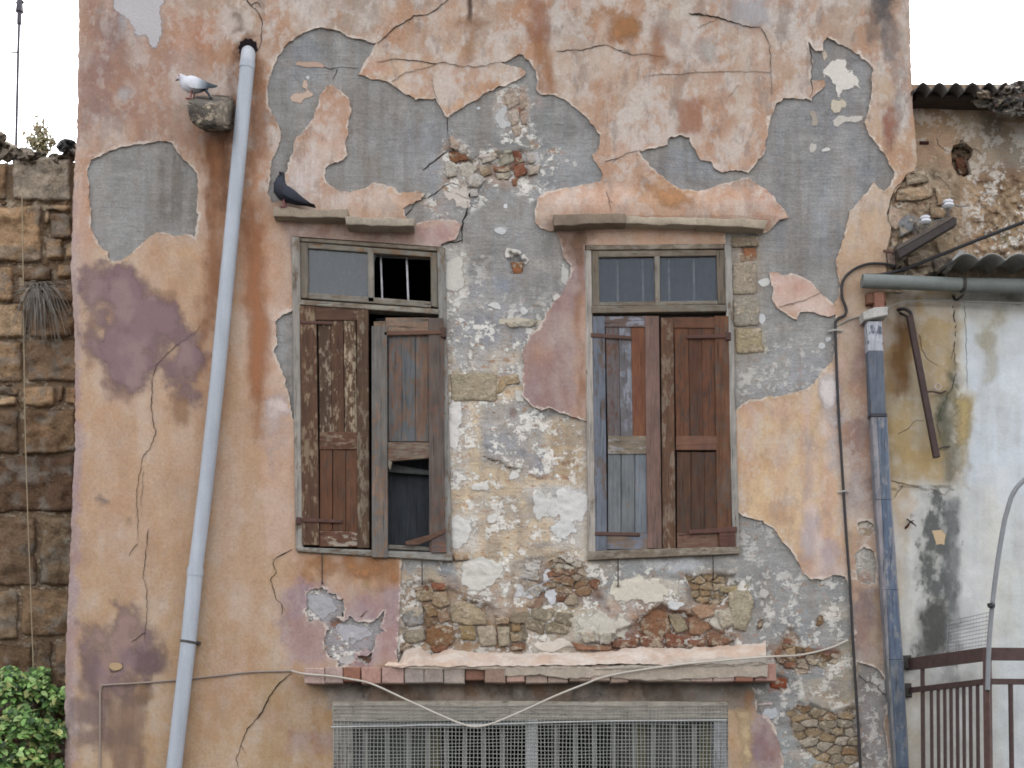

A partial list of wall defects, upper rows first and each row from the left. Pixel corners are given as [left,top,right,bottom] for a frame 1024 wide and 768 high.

crack [324,0,502,96]
crack [564,13,773,96]
spalling [87,142,199,261]
spalling [951,137,971,176]
leakage [78,259,205,420]
spalling [267,28,894,768]
crack [129,331,196,641]
leakage [917,489,959,656]
crack [236,673,292,765]